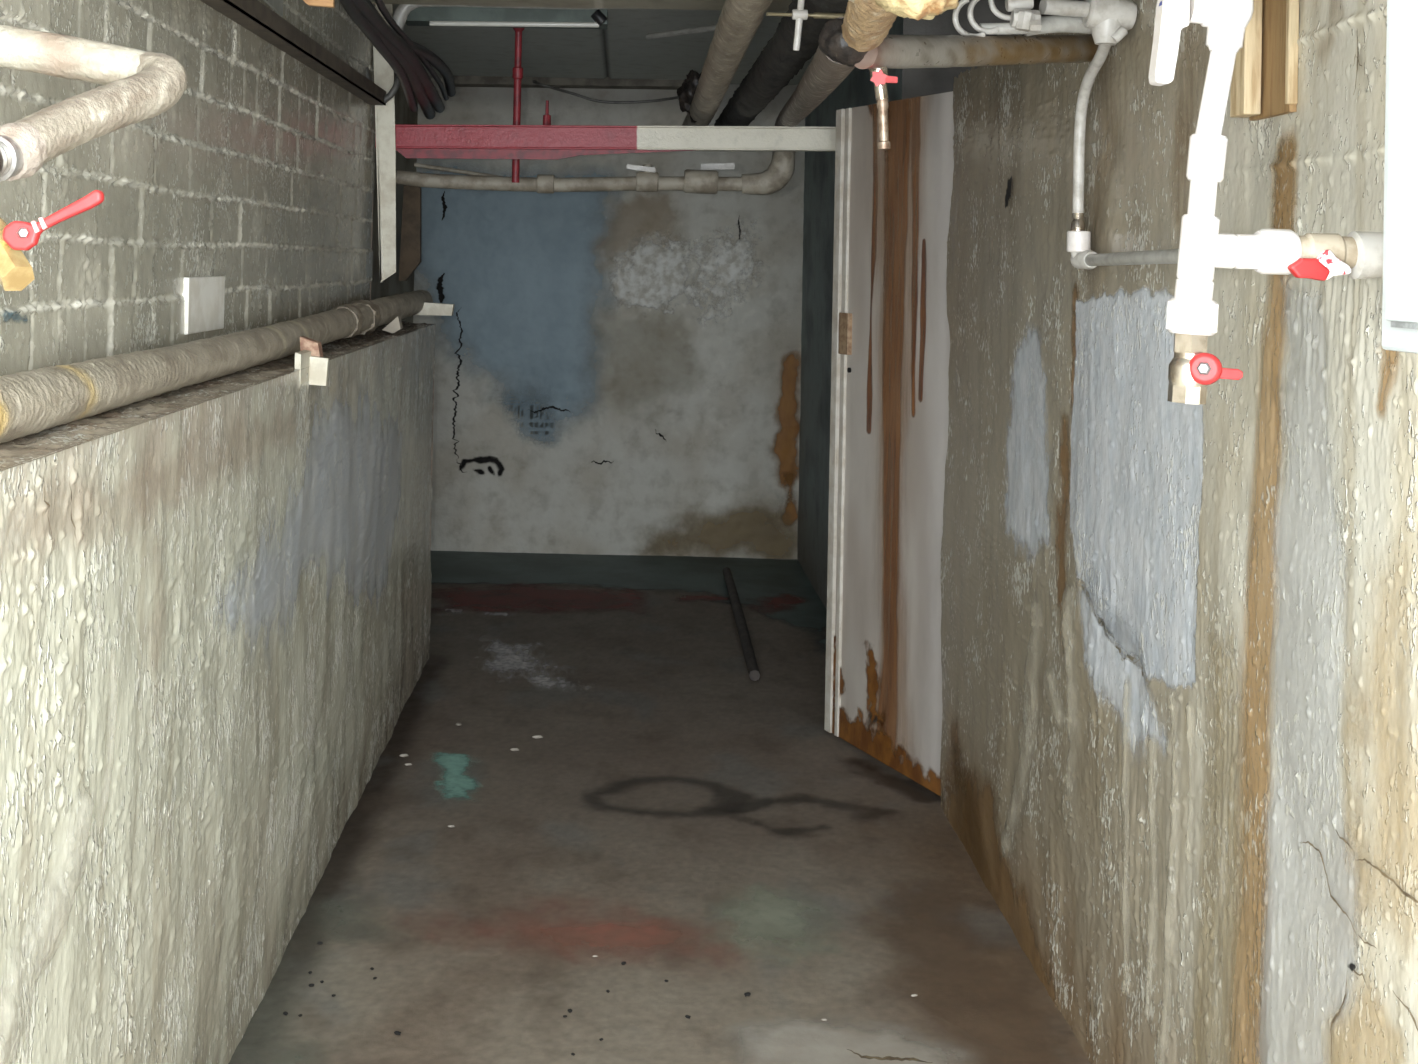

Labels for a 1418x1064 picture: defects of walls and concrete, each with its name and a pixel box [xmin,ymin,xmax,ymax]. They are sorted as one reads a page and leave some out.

rust [1272,138,1294,230]
damp [648,507,797,559]
rust [773,353,800,526]
rust [832,96,1058,1008]
rust [1230,274,1288,1064]
crack [1300,829,1418,1063]